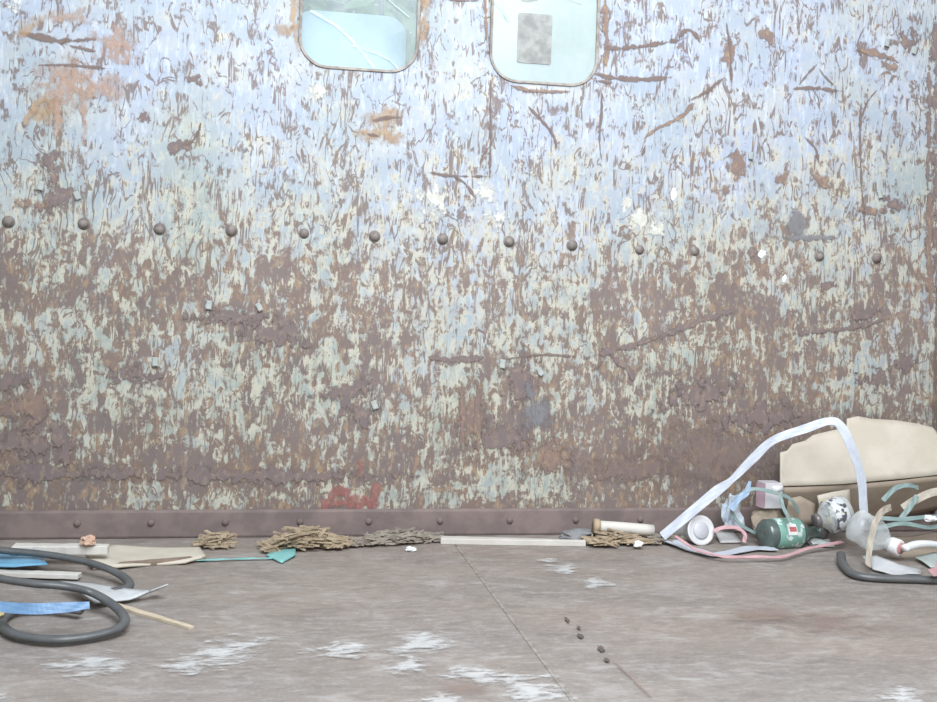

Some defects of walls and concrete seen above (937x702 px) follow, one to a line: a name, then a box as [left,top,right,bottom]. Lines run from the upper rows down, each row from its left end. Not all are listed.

corrosion [601,0,610,66]
peeling [758,26,775,46]
peeling [856,26,921,71]
peeling [14,149,81,216]
corrosion [24,52,124,145]
peeling [168,124,201,156]
corrosion [358,109,400,143]
corrosion [510,85,569,93]
peeling [642,23,735,156]
peeling [722,148,754,195]
corrosion [924,17,937,311]
corrosion [565,372,813,490]